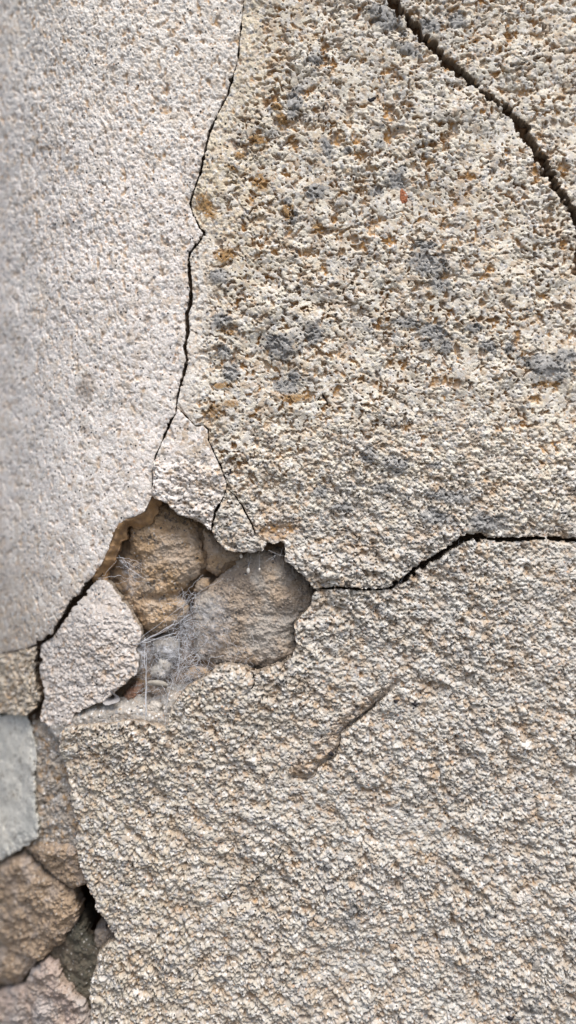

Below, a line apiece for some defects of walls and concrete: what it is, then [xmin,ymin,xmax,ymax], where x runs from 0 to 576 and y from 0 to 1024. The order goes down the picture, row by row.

crack [387,0,468,87]
crack [502,109,576,276]
crack [152,8,254,529]
spalling [255,521,300,553]
crack [312,533,576,593]
crack [4,572,103,721]
flaking render [2,409,248,883]
spalling [0,917,100,1010]